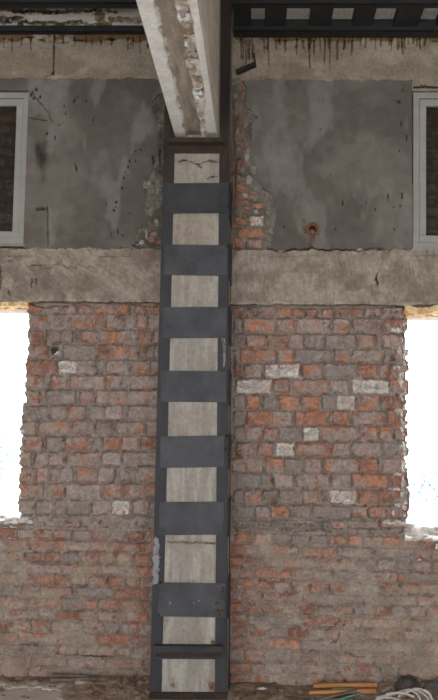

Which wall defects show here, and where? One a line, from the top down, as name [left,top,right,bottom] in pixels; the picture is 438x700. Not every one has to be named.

crack [45,35,56,77]
spalling [154,0,207,137]
spalling [132,94,165,250]
spalling [231,77,285,251]